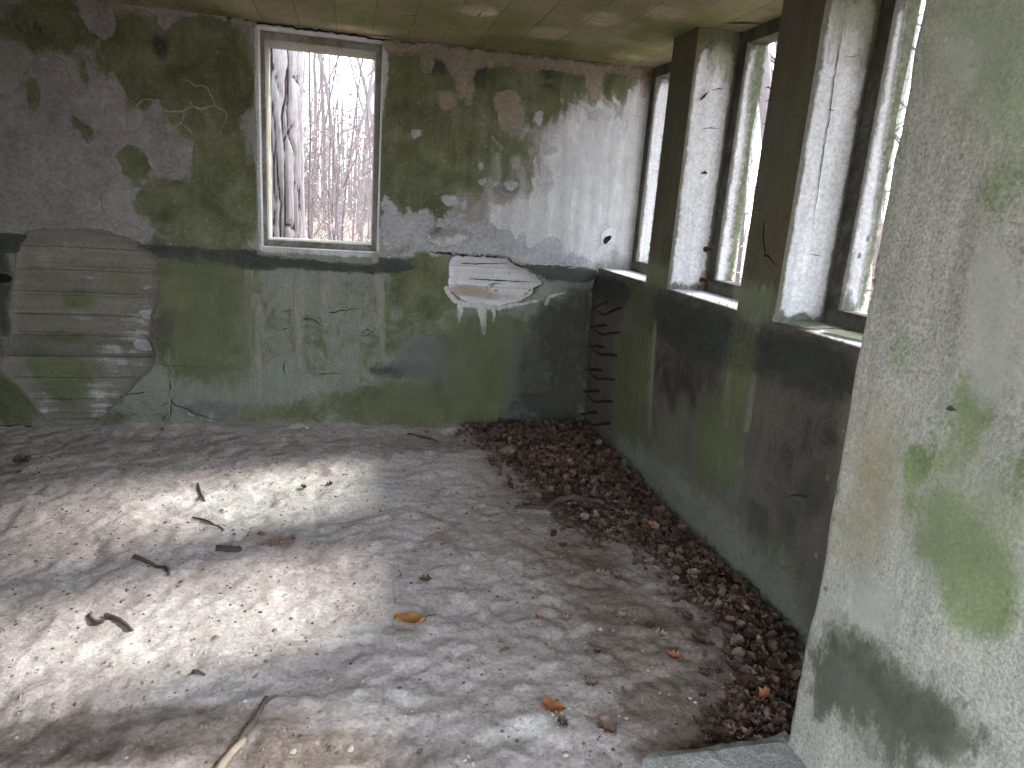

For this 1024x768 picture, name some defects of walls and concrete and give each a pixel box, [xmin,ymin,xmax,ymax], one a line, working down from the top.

peeling [493,90,543,132]
crack [811,16,858,256]
peeling [478,163,518,190]
spalling [0,48,194,426]
peeling [379,195,591,306]
crack [762,222,777,266]
crack [282,308,373,336]
damp [444,266,854,432]
crack [120,363,233,425]